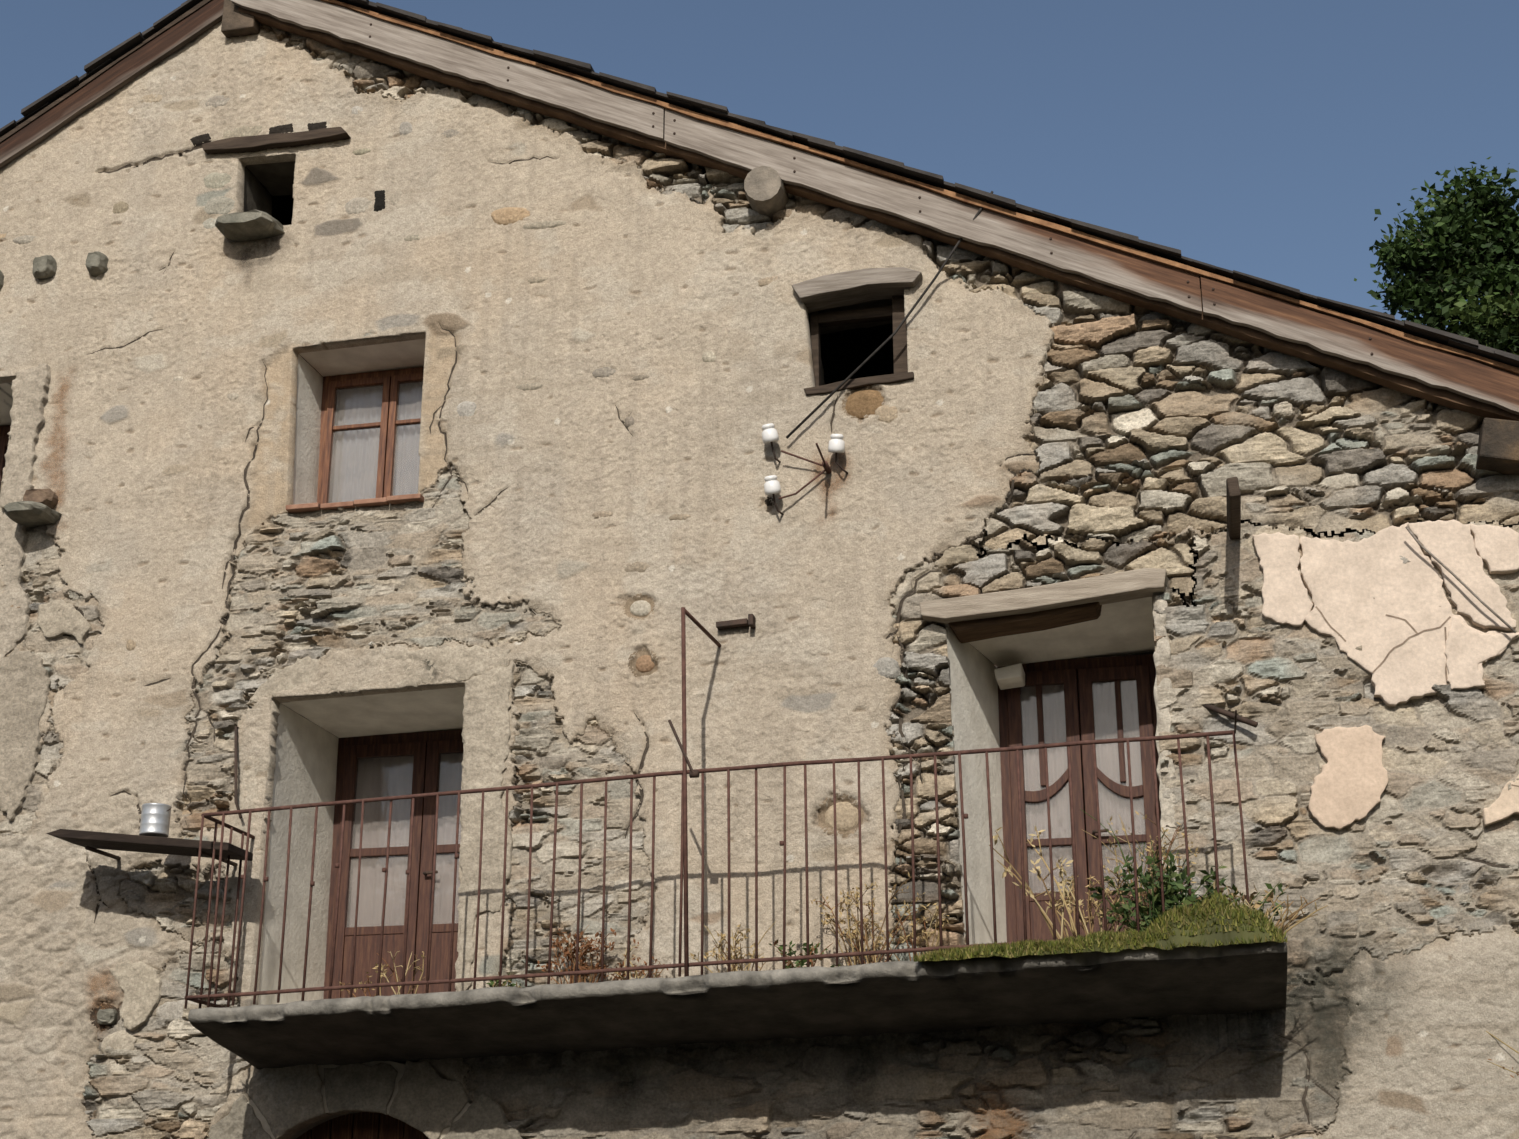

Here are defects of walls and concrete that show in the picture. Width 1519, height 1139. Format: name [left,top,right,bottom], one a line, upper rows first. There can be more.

flaking render [260,24,486,107]
crack [145,362,268,827]
flaking render [177,464,657,988]
crack [429,323,507,515]
flaking render [463,99,1519,1139]